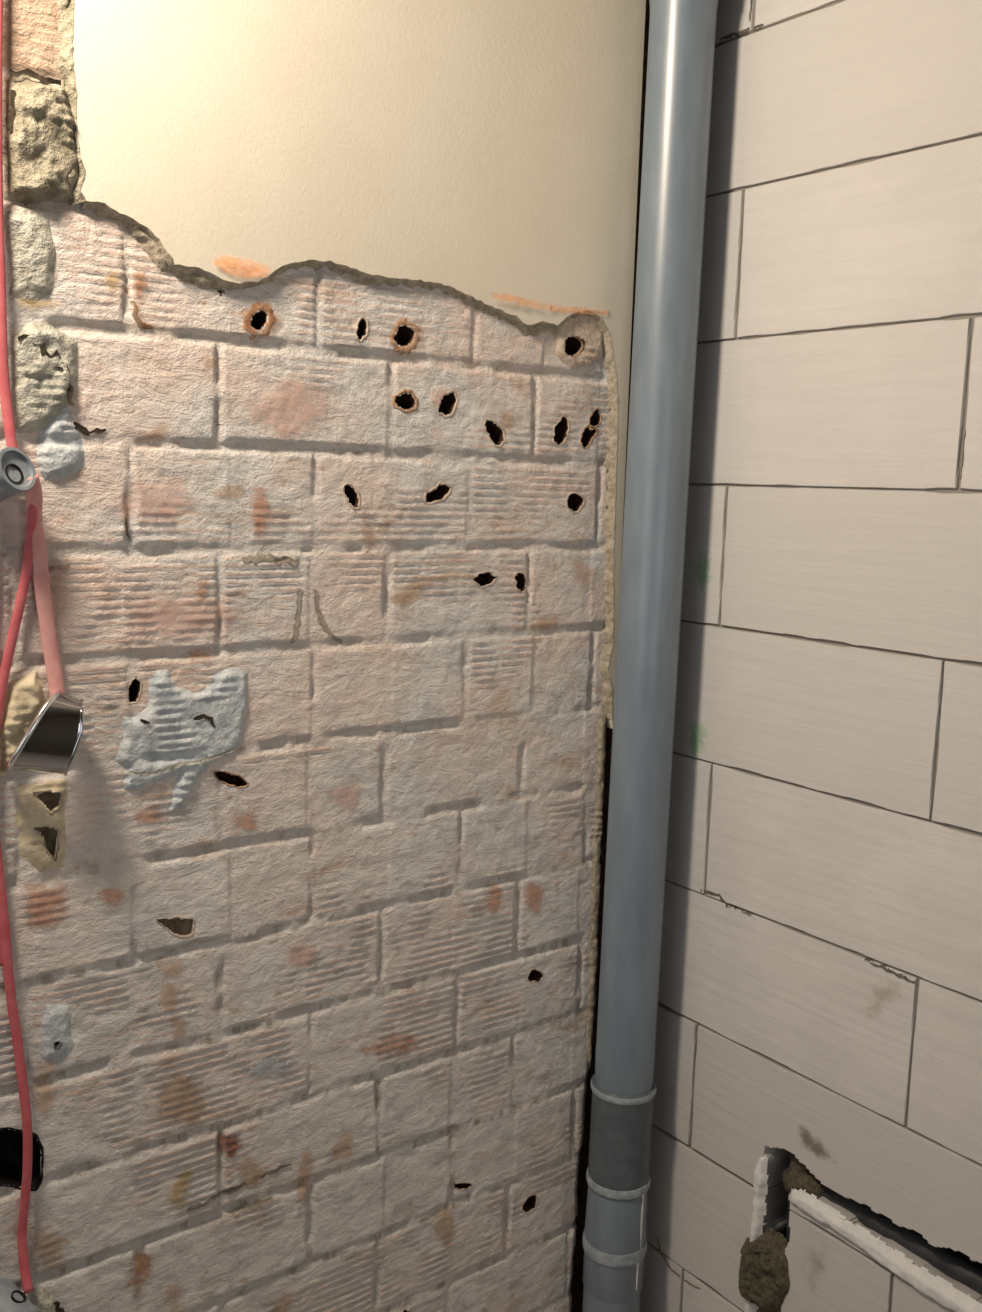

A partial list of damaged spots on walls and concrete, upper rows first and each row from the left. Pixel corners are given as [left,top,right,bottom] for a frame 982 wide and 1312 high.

flaking render [55,0,618,719]
spalling [213,770,249,788]
spalling [34,790,63,861]
peeling [28,884,66,927]
spalling [155,916,195,938]
spalling [527,968,544,984]
peeling [218,1135,241,1157]
crack [187,1163,291,1216]
spalling [452,1182,473,1191]
spalling [521,1194,538,1214]